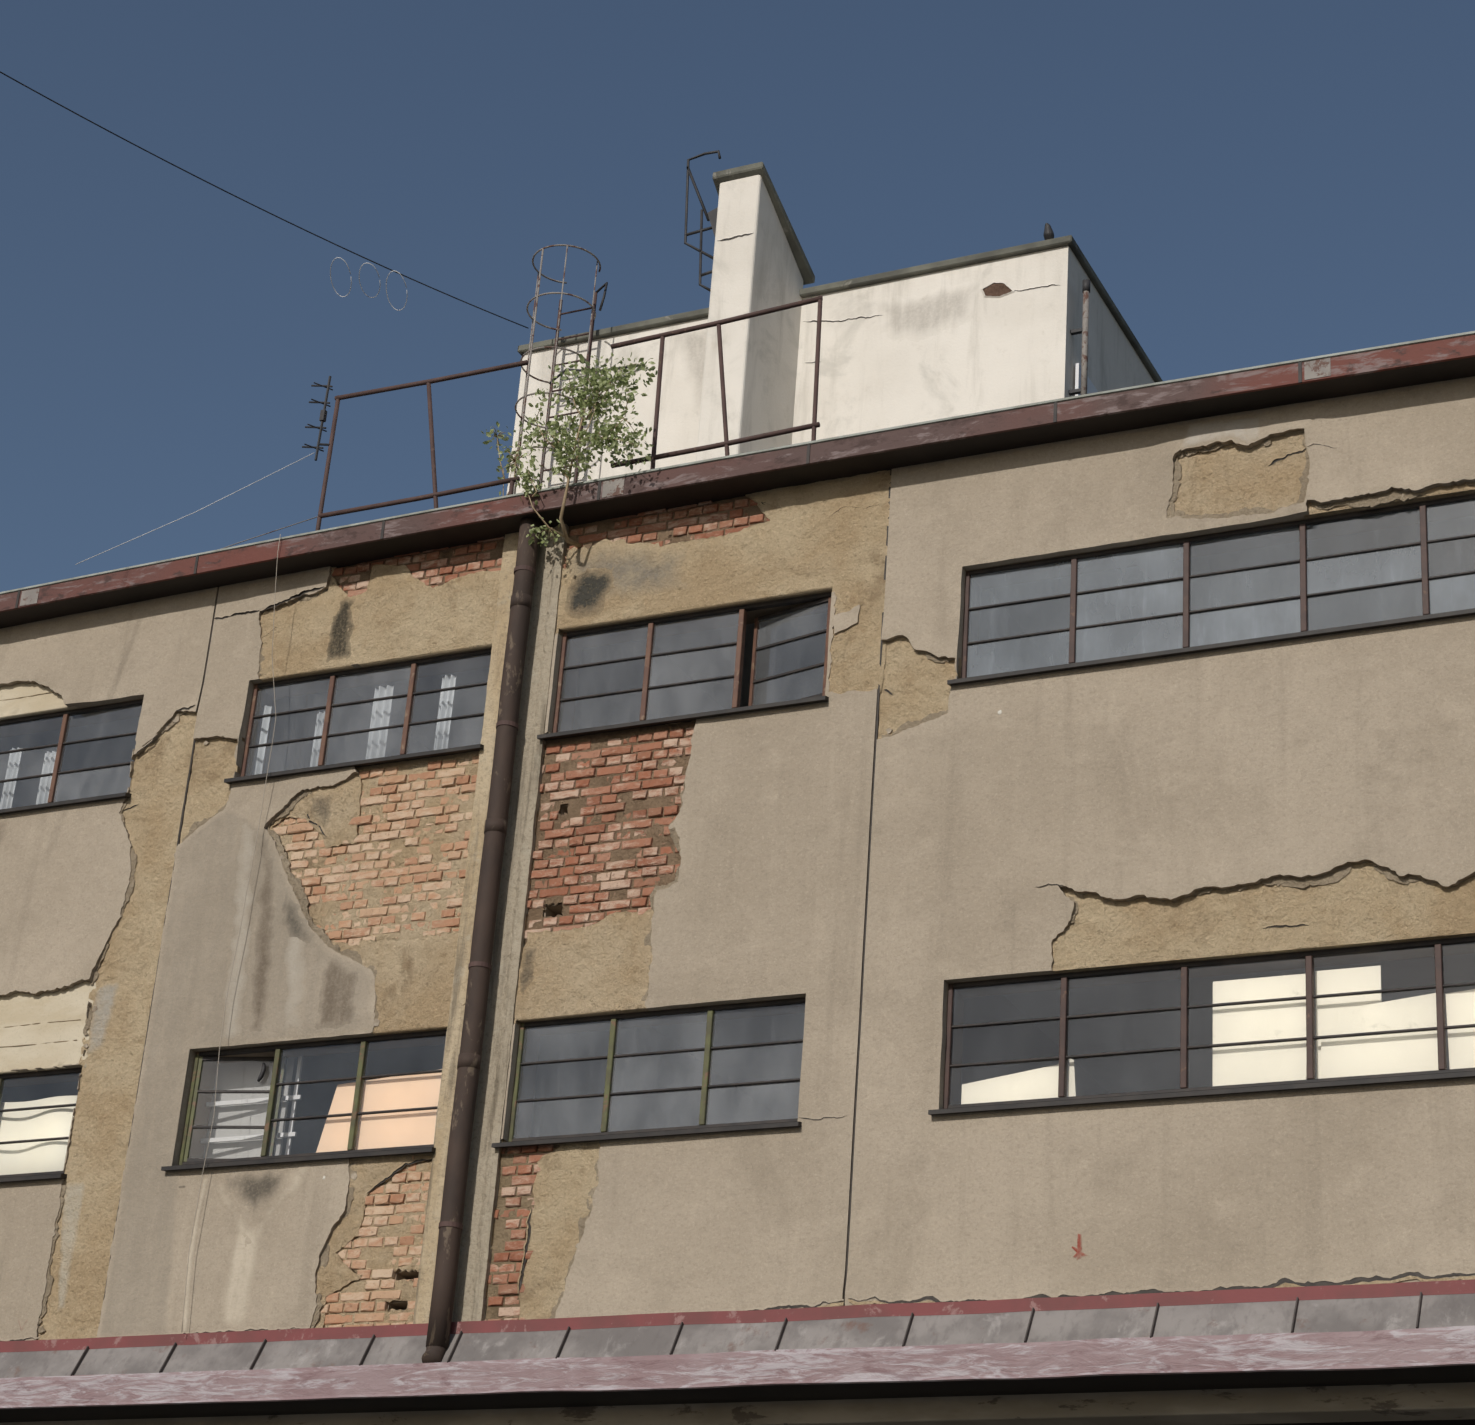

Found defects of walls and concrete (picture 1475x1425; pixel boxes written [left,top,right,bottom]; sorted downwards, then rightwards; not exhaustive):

spalling [0,680,62,696]
flaking render [257,537,505,679]
damp [564,539,689,620]
flaking render [563,498,770,569]
spalling [882,635,955,661]
spalling [1167,428,1304,509]
flaking render [264,756,479,960]
flaking render [524,727,694,939]
spalling [1051,859,1475,971]
damp [97,810,375,1338]
flaking render [310,1155,431,1328]
flaking render [484,1139,557,1321]